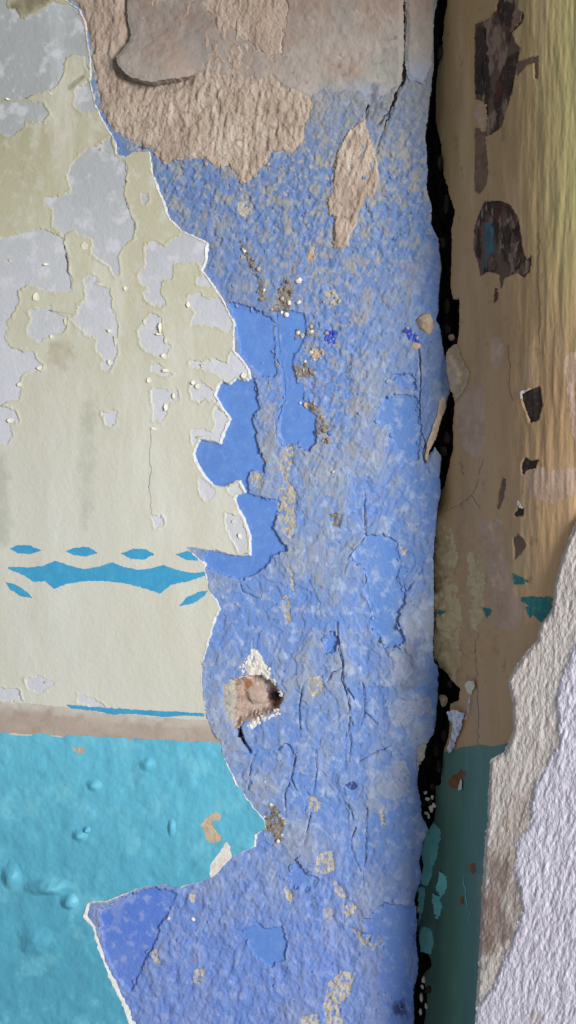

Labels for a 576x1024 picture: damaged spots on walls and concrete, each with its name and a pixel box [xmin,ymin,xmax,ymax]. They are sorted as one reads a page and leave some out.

flaking render [200,0,247,41]
crack [366,0,406,139]
peeling [473,0,539,302]
peeling [0,137,135,444]
peeling [139,233,206,307]
crack [419,0,482,511]
peeling [520,386,543,422]
crack [278,688,317,845]
crack [330,625,390,761]
crack [419,634,479,831]
flaking render [470,523,576,1024]
crack [415,906,432,1024]